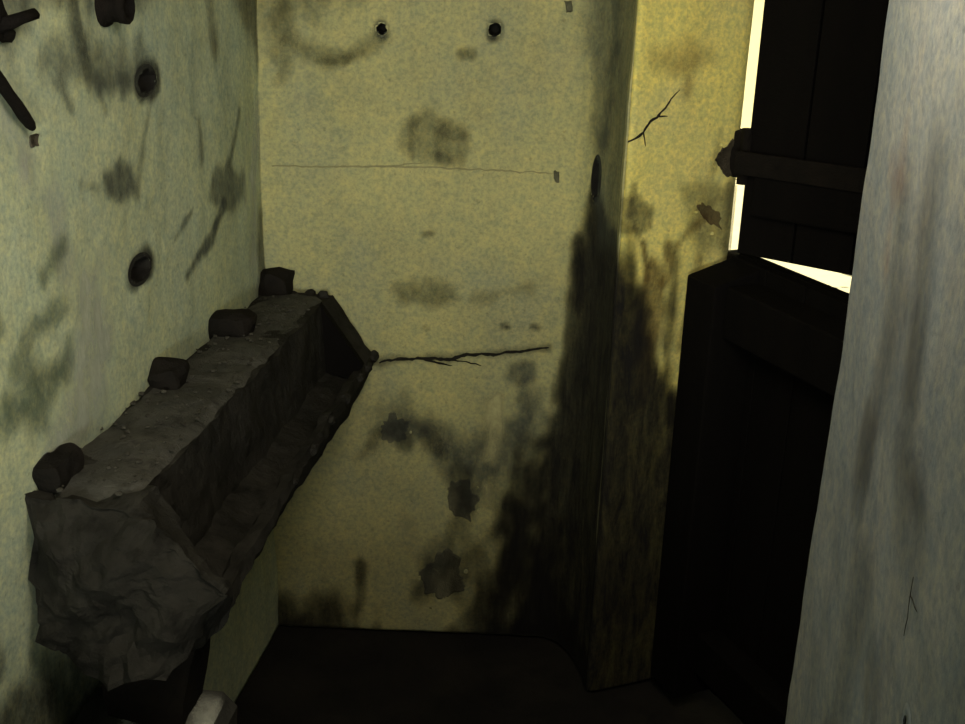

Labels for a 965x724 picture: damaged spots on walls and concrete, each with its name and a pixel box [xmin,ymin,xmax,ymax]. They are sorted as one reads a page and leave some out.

crack [628,90,680,146]
crack [379,347,549,366]
damp [392,128,677,691]
damp [278,598,347,628]